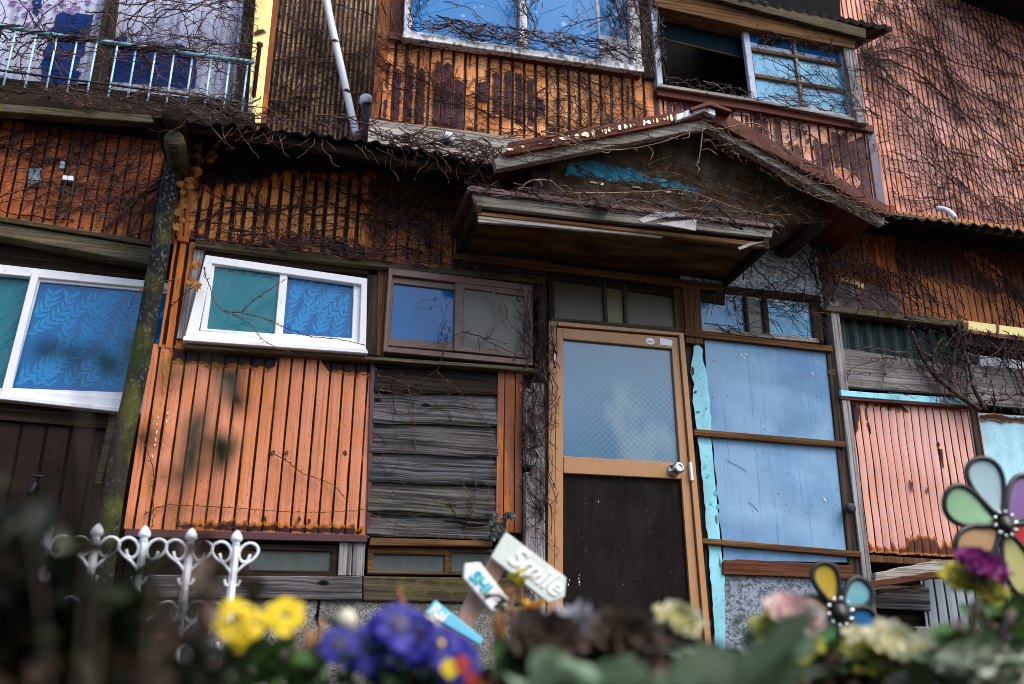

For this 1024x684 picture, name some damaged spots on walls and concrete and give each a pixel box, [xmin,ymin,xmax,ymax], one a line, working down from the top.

peeling [539,115,673,144]
corrosion [161,345,278,405]
corrosion [321,360,370,377]
corrosion [175,516,365,535]
corrosion [868,533,953,557]